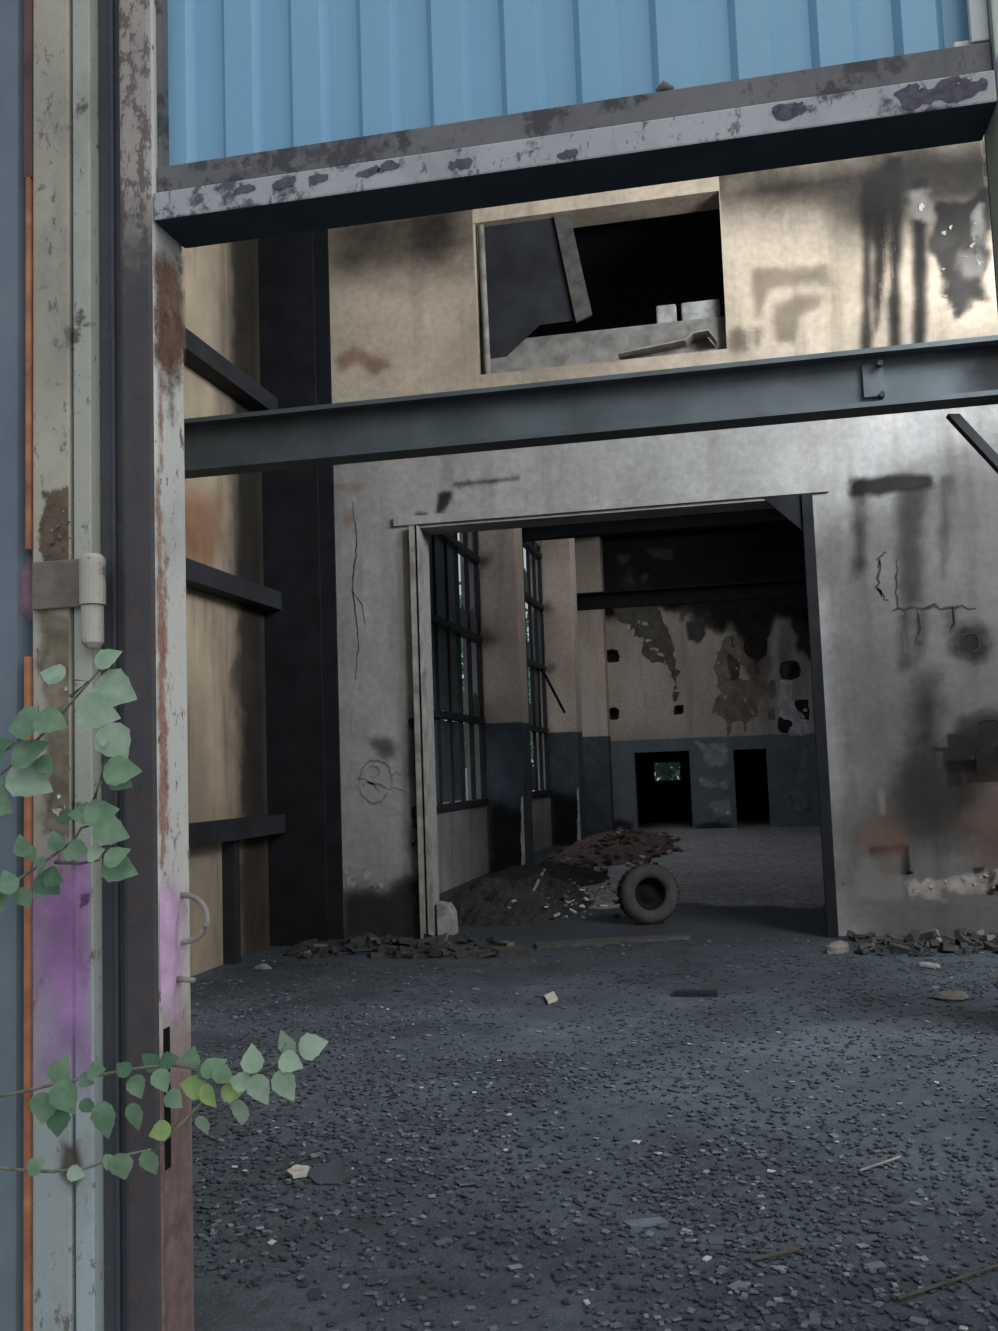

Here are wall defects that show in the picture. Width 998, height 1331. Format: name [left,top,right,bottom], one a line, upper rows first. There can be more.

peeling [772,101,812,121]
peeling [894,76,988,110]
peeling [272,174,328,189]
peeling [356,160,400,178]
leakage [873,221,927,346]
corrosion [154,256,186,438]
corrosion [156,455,168,865]
peeling [613,606,684,715]
leakage [686,611,708,643]
leakage [732,602,810,695]
crack [875,552,976,645]
spalling [695,636,810,817]